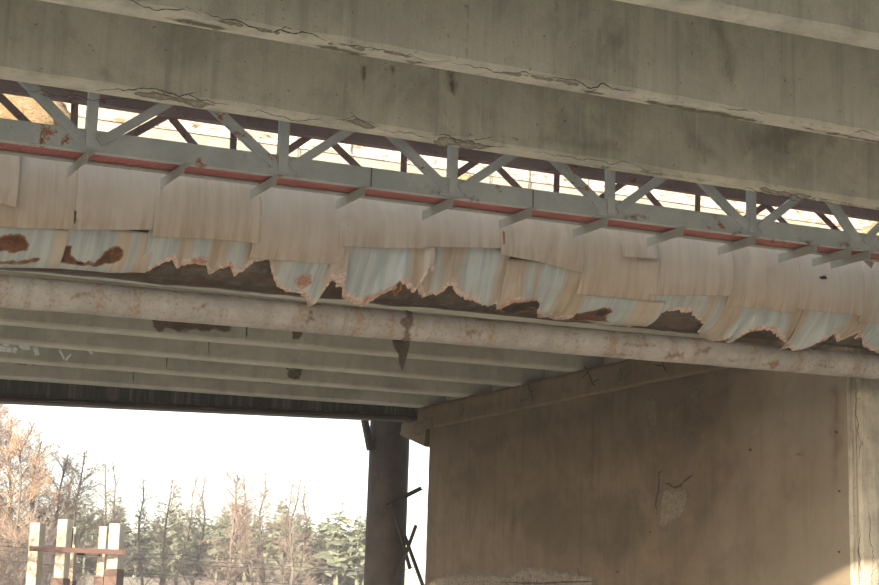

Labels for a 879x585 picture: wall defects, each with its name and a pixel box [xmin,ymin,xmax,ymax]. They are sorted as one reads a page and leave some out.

crack [131,0,631,93]
crack [12,86,227,105]
crack [247,110,507,148]
rust [0,234,40,265]
rust [61,245,123,267]
rust [153,320,230,332]
rust [570,308,613,322]